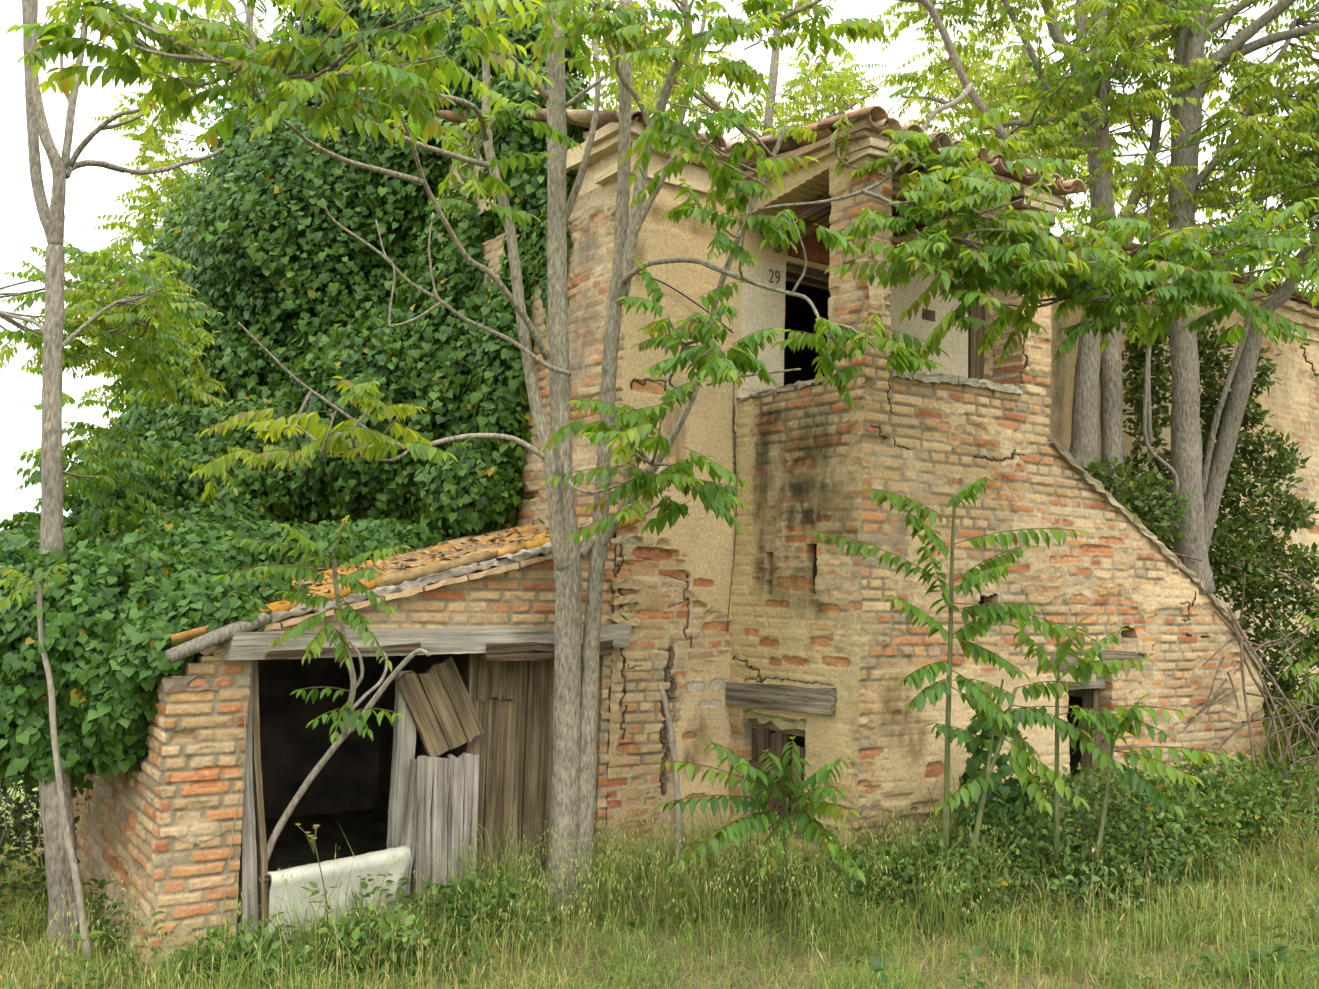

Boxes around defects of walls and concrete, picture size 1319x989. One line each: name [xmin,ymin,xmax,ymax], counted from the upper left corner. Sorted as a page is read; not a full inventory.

crack [1295,325,1319,376]
crack [730,405,738,474]
spalling [616,545,674,579]
spalling [693,577,716,588]
crack [614,544,693,795]
crack [732,656,830,685]
spalling [682,731,698,741]